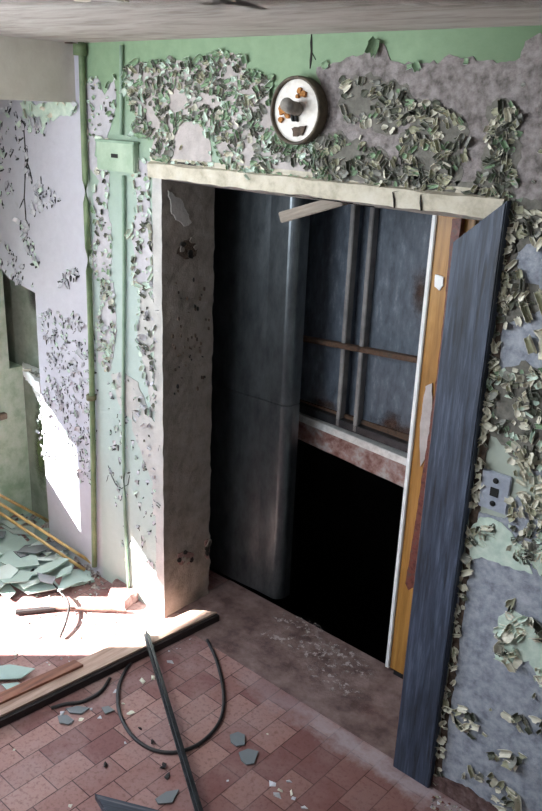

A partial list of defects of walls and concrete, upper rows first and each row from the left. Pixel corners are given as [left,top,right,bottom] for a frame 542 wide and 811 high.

peeling [0,217,40,285]
peeling [0,97,80,217]
peeling [29,308,97,485]
peeling [57,267,80,289]
peeling [86,74,117,372]
peeling [107,158,161,526]
peeling [119,33,542,811]